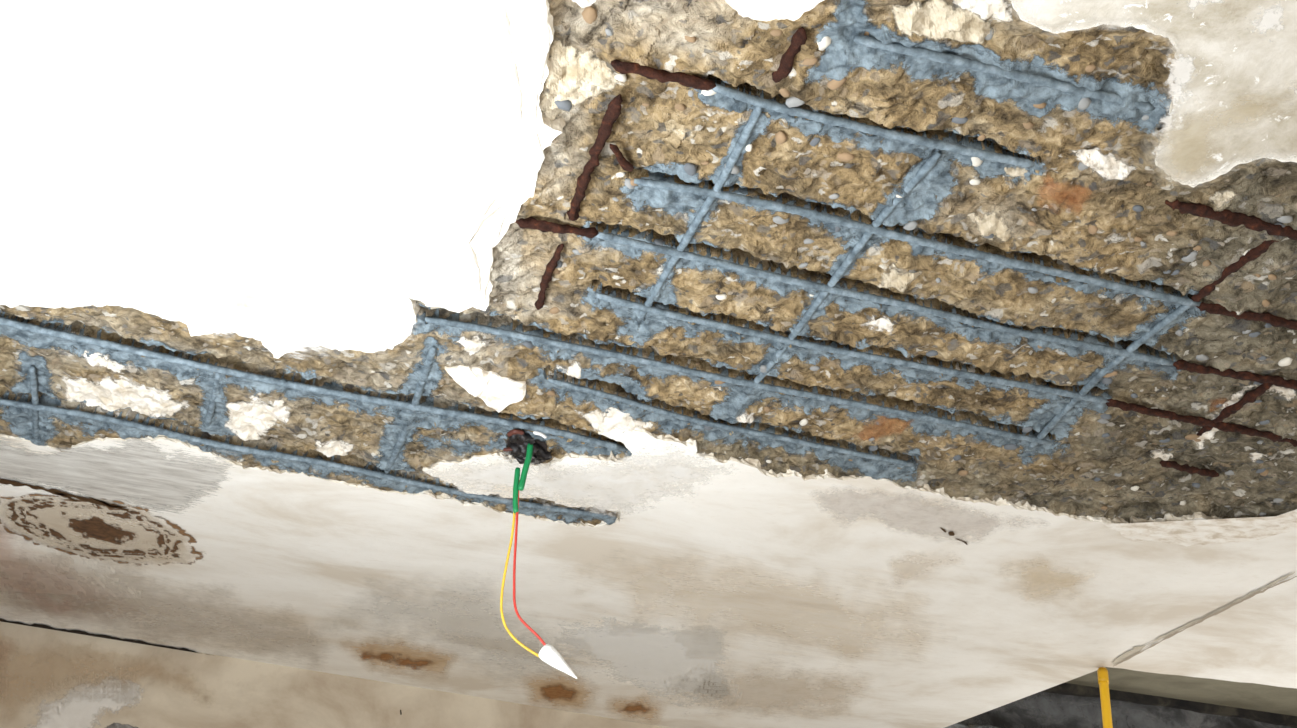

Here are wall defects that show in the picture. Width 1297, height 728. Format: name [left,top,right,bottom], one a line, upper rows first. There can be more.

corrosion [610,59,716,91]
corrosion [516,217,598,238]
spalling [0,0,1297,547]
corrosion [1191,240,1297,330]
corrosion [1173,359,1297,390]
corrosion [1105,398,1297,447]
leakage [0,494,203,566]
corrosion [351,644,450,672]
corrosion [530,677,588,705]